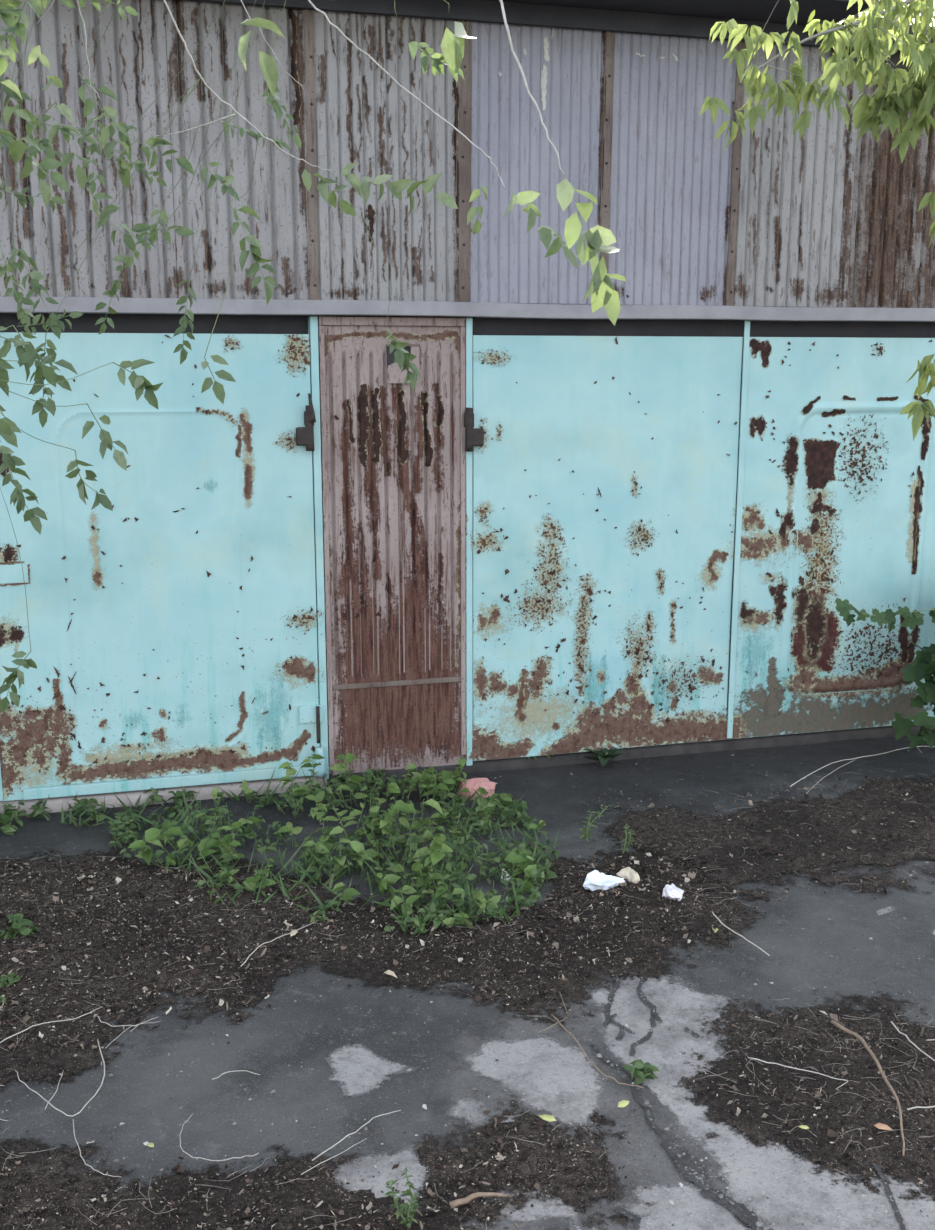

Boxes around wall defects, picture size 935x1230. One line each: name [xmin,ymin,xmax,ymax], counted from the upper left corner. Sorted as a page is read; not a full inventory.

rust [0,0,231,298]
rust [288,8,435,300]
rust [452,79,472,302]
rust [732,76,935,308]
rust [201,229,259,297]
rust [273,329,511,398]
rust [749,338,772,367]
rust [196,407,254,507]
rust [0,623,24,652]
rust [0,543,31,586]
rust [277,383,932,769]
rust [0,666,315,801]